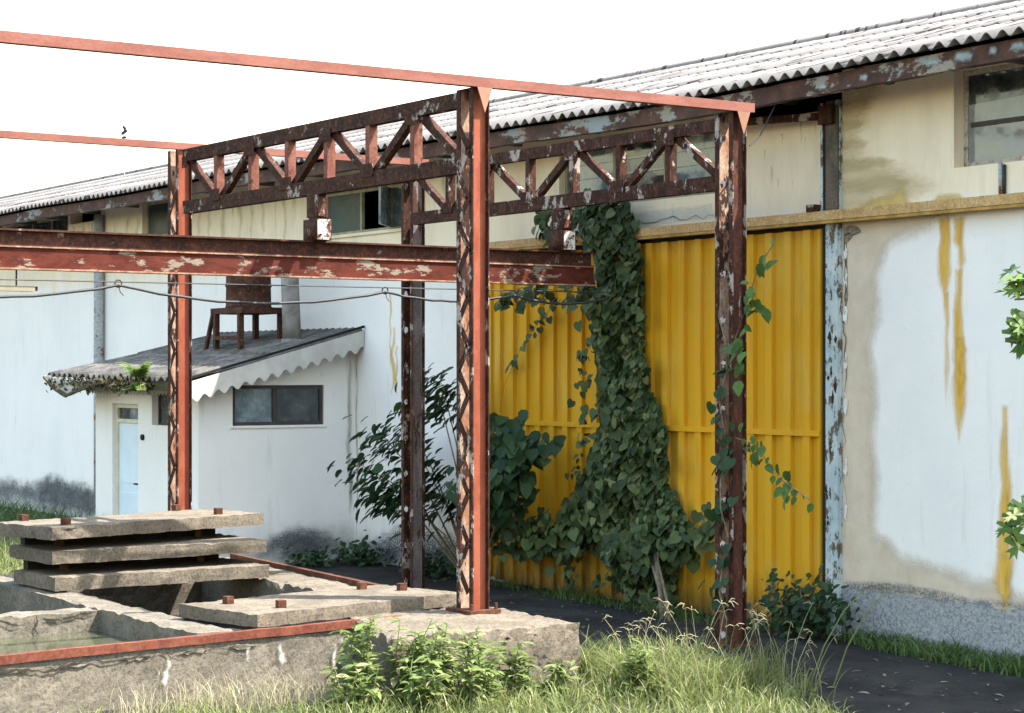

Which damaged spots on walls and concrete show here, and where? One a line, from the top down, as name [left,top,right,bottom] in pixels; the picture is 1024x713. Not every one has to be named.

peeling [955,52,972,61]
leakage [0,476,94,512]
peeling [825,215,1024,609]
rust [940,219,965,429]
rust [996,409,1011,602]